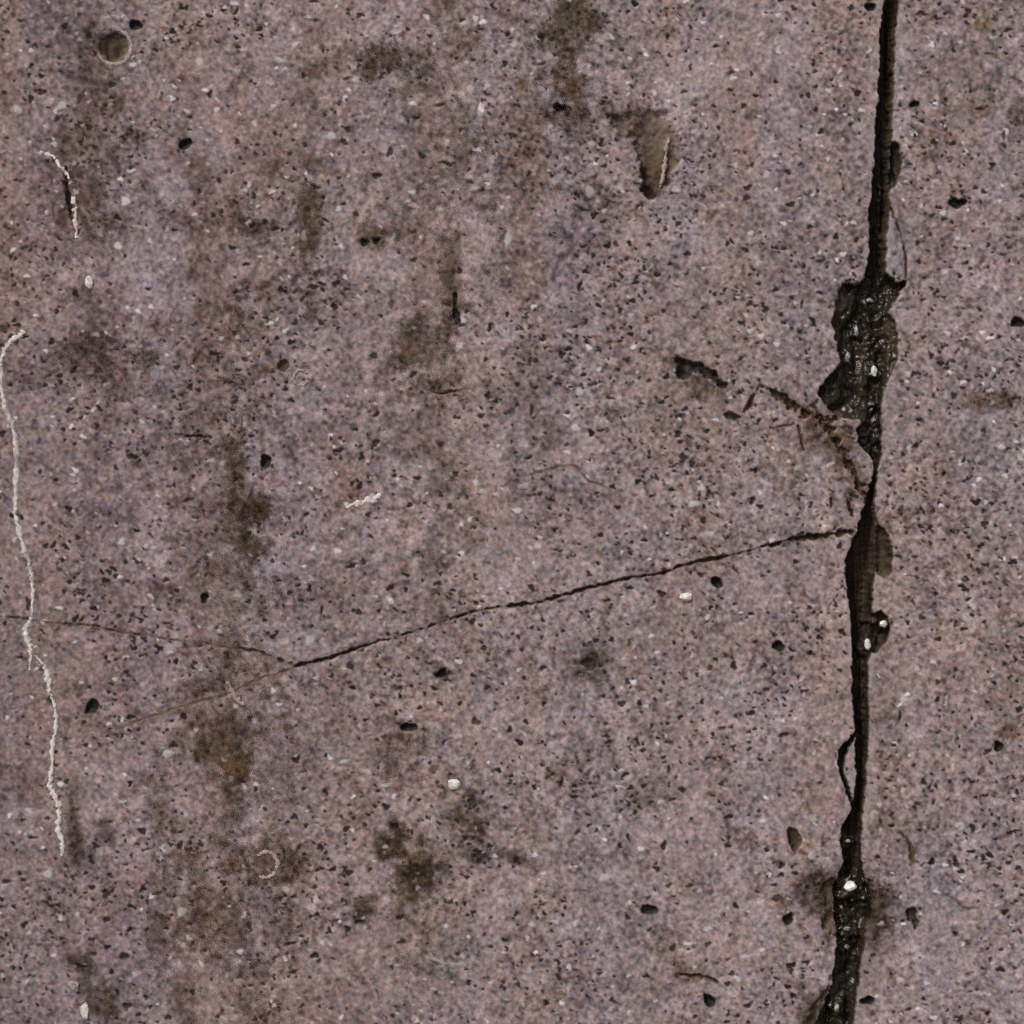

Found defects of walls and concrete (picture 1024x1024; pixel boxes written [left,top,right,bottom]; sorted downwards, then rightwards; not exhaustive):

spalling [605,107,681,202]
crack [62,165,74,222]
crack [426,386,472,396]
spalling [668,356,730,391]
spalling [723,410,742,422]
crack [174,432,213,440]
crack [523,462,617,495]
crack [741,0,909,1024]
crack [0,527,857,694]
crack [678,972,721,986]